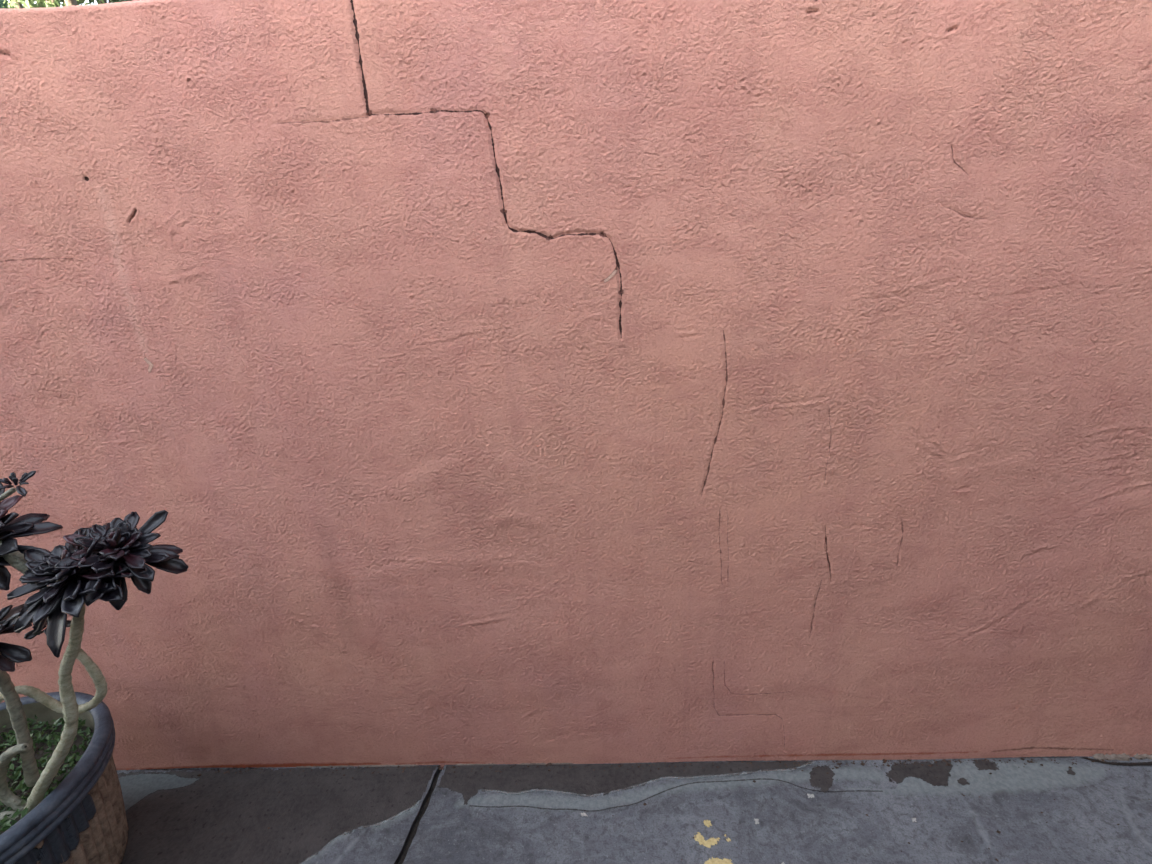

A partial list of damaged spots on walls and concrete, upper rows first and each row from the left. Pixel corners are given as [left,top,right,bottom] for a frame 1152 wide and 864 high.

crack [350,0,624,338]
crack [702,330,728,491]